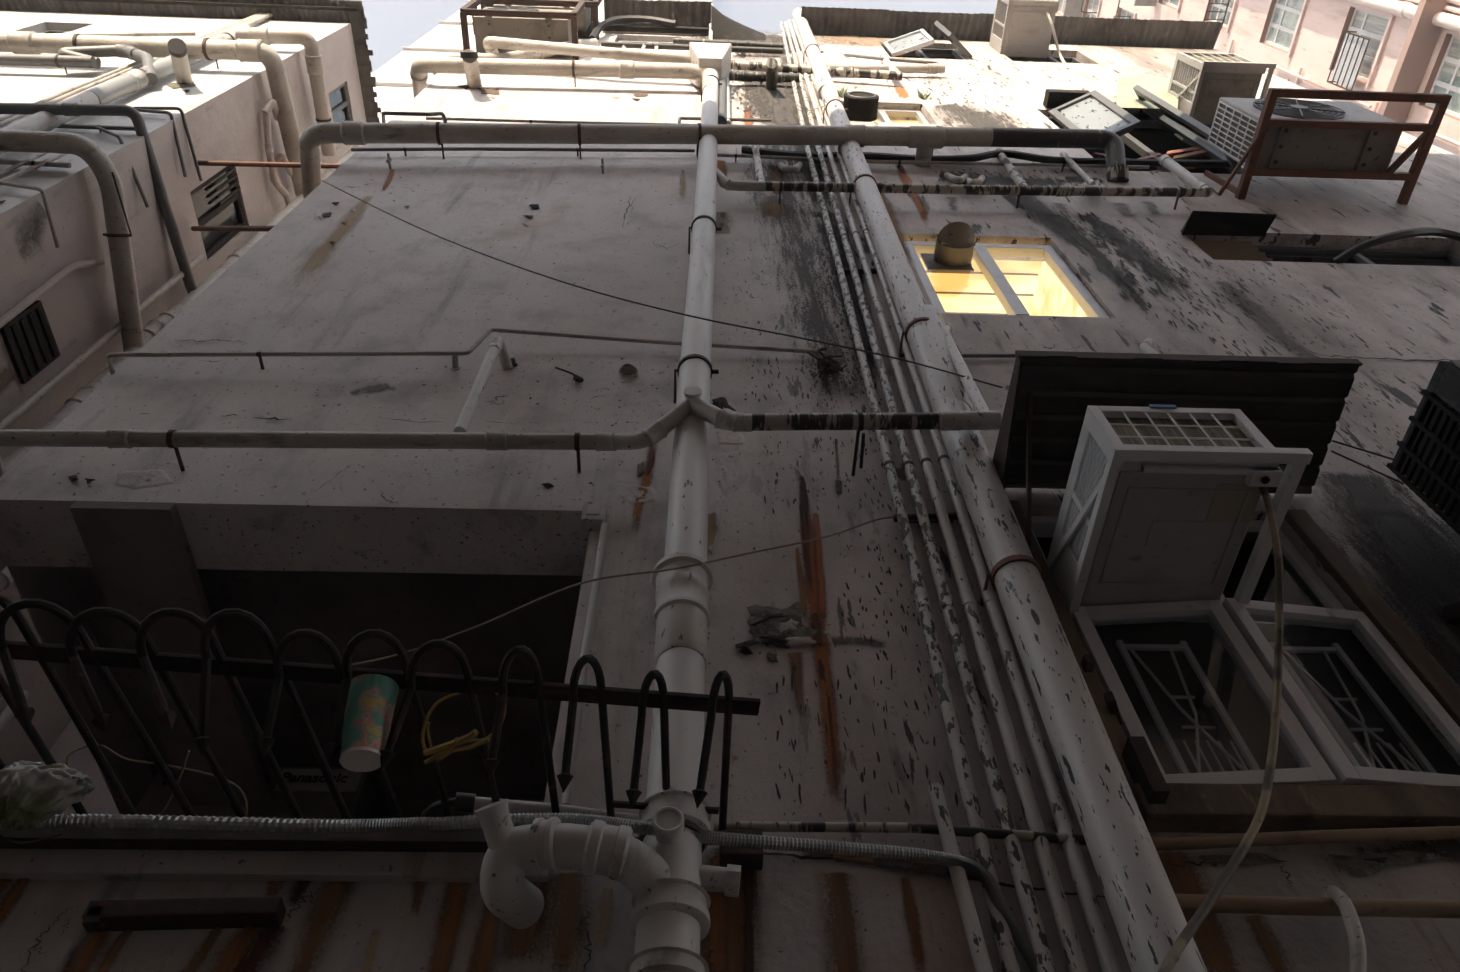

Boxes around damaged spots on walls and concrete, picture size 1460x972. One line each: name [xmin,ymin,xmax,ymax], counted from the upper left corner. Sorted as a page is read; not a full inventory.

damp [730,70,810,125]
damp [812,212,877,380]
damp [1049,201,1192,298]
rust [788,477,841,793]
rust [61,929,132,972]
rust [428,882,546,972]
rust [703,870,760,972]
rust [823,872,861,972]
rust [902,878,925,967]